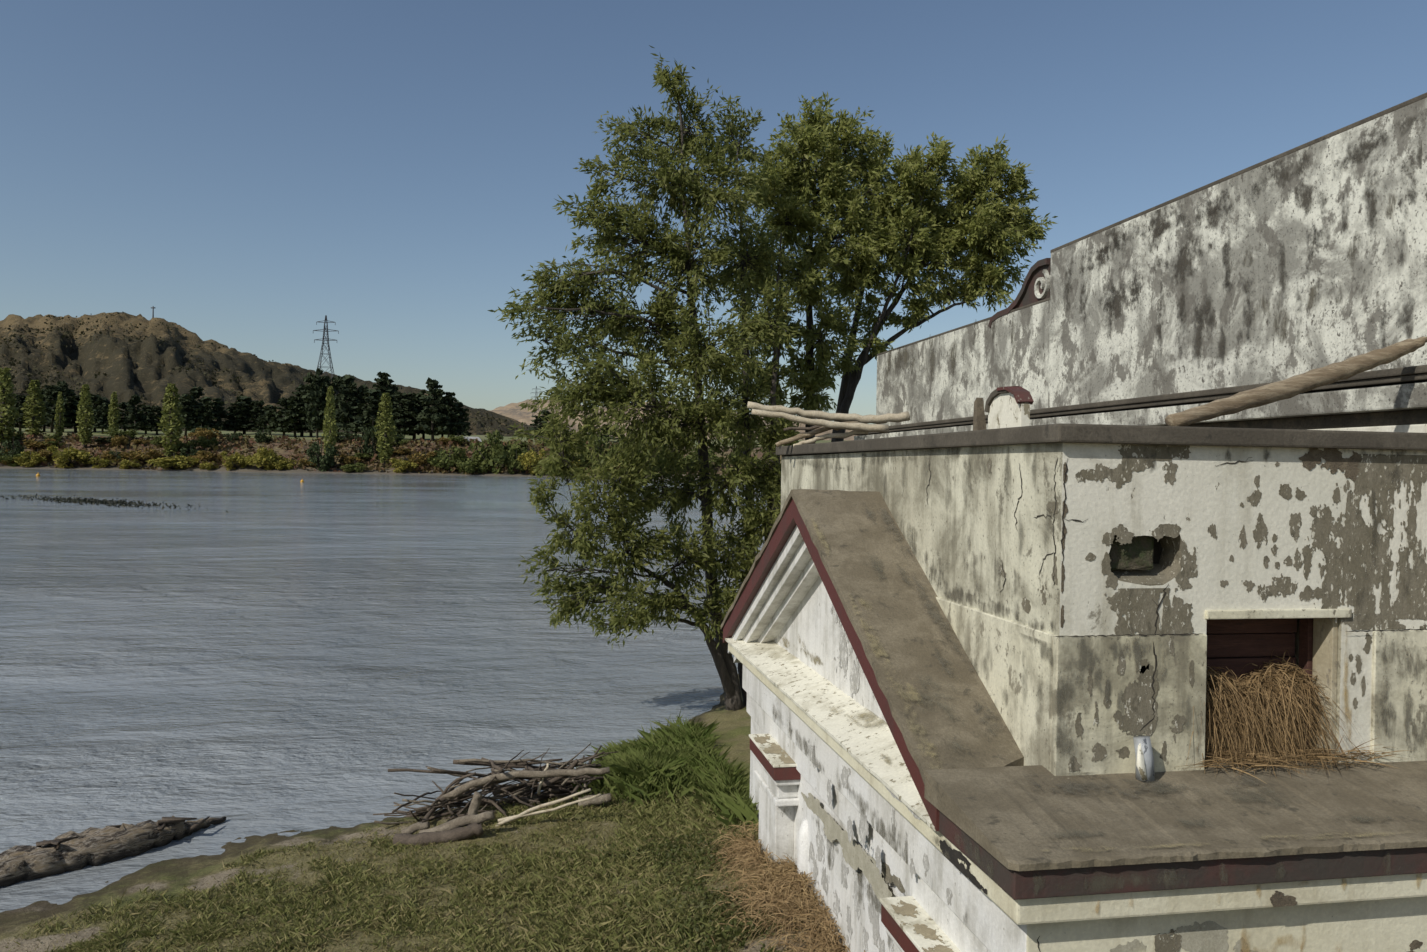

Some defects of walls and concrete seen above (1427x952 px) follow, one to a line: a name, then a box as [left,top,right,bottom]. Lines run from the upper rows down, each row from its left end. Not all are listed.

leakage [1253,155,1326,258]
leakage [1343,132,1387,175]
leakage [1365,145,1422,227]
leakage [1065,194,1288,362]
leakage [1380,304,1413,347]
peeling [1063,444,1191,488]
peeling [1019,501,1068,628]
peeling [1085,524,1198,656]
peeling [1220,448,1427,709]
peeling [1068,654,1186,772]
leakage [1382,690,1427,745]
peeling [1110,921,1258,952]